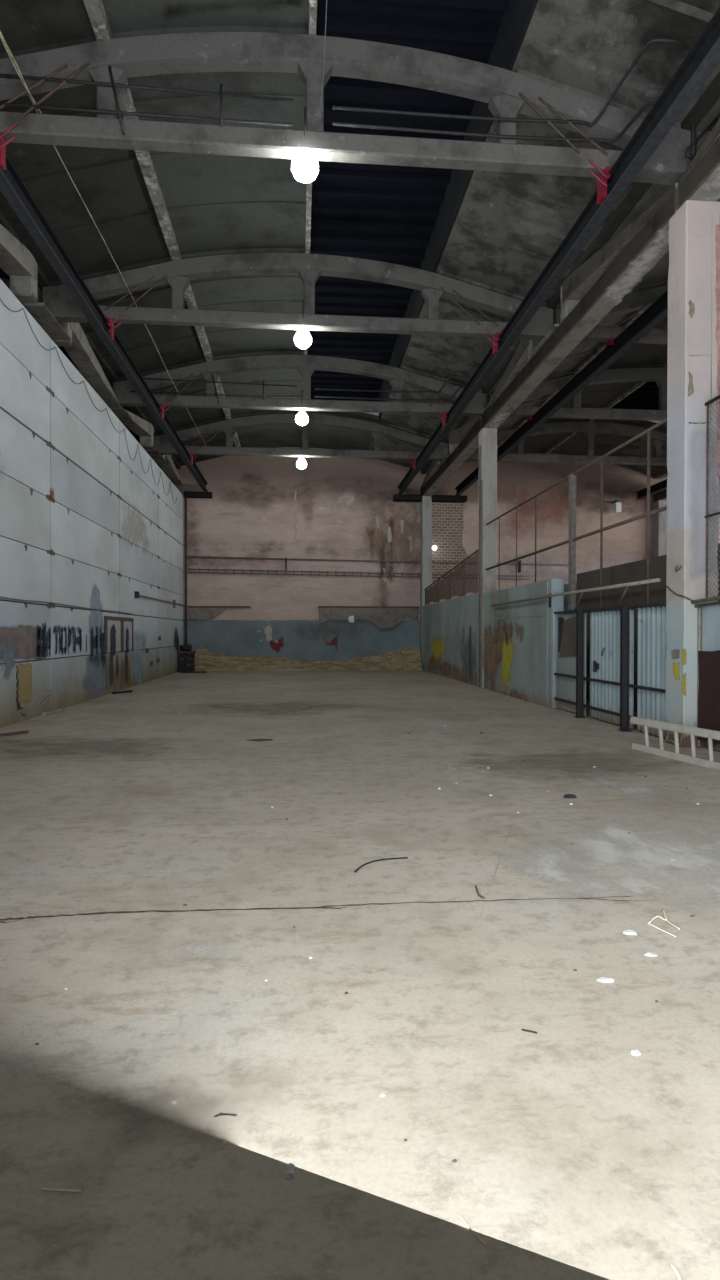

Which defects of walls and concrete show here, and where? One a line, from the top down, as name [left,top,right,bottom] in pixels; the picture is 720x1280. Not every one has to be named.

corrosion [18,664,32,703]
corrosion [428,619,527,701]
crack [0,825,640,923]